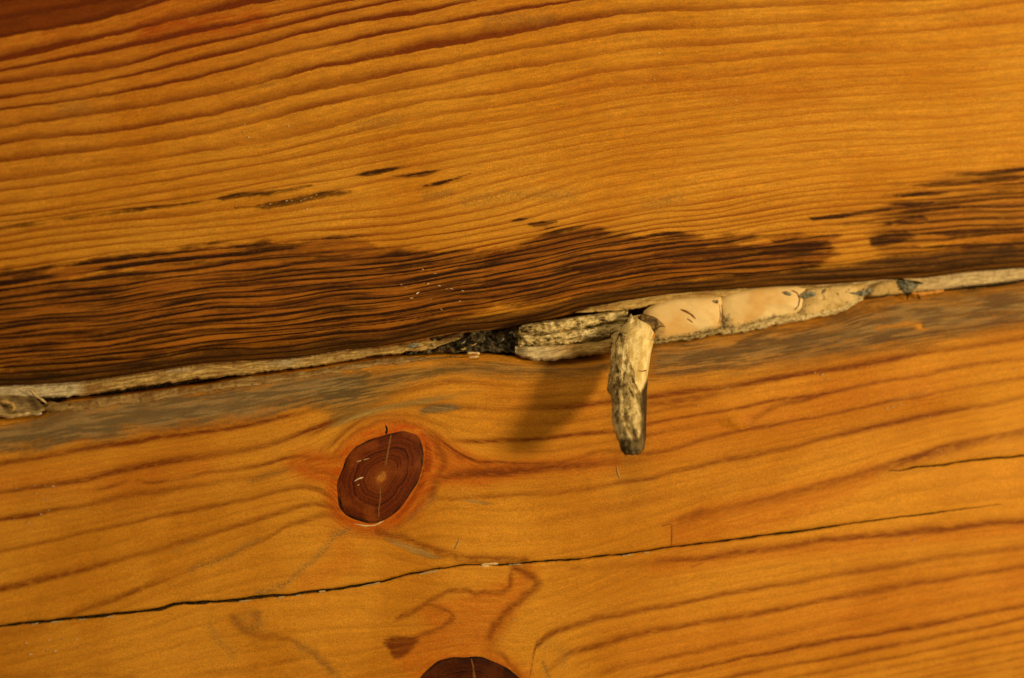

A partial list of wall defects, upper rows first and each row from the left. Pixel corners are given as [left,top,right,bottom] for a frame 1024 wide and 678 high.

crack [890,455,1024,471]
crack [0,504,1003,627]